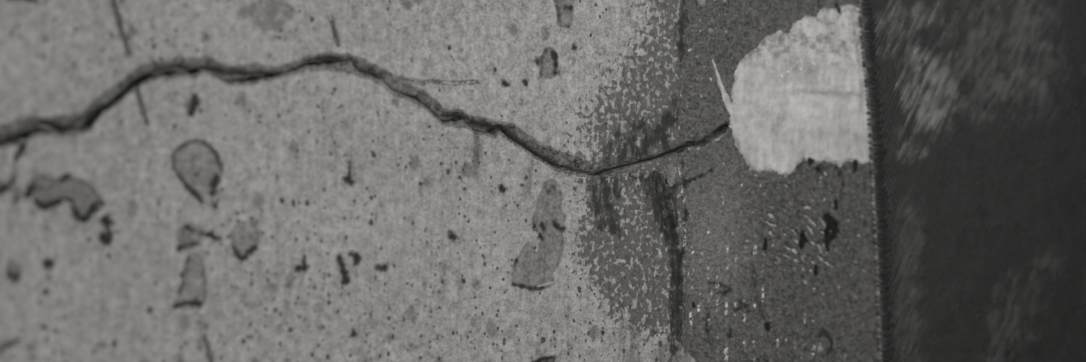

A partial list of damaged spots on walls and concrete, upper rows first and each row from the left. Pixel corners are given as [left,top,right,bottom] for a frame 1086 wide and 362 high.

crack [0,0,730,353]